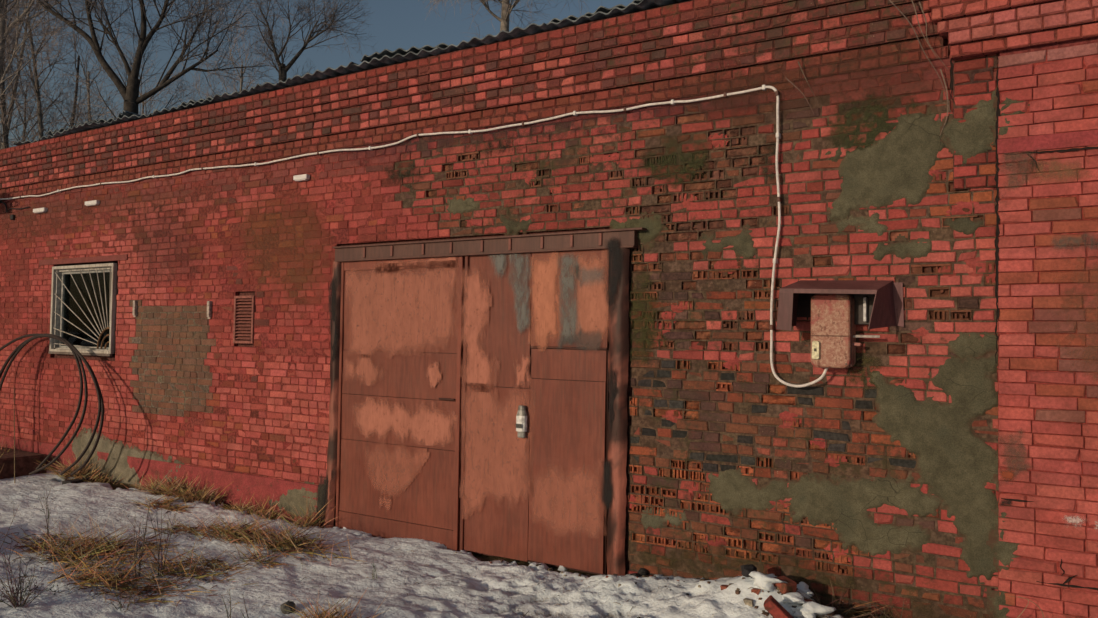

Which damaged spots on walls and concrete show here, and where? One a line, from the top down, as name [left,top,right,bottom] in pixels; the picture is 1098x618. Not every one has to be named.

spalling [773,205,789,216]
spalling [929,170,985,227]
spalling [579,113,781,392]
spalling [814,257,831,266]
spalling [911,256,996,297]
spalling [888,310,971,354]
spalling [629,397,637,416]
spalling [655,401,701,423]
spalling [762,384,802,430]
spalling [809,438,865,467]